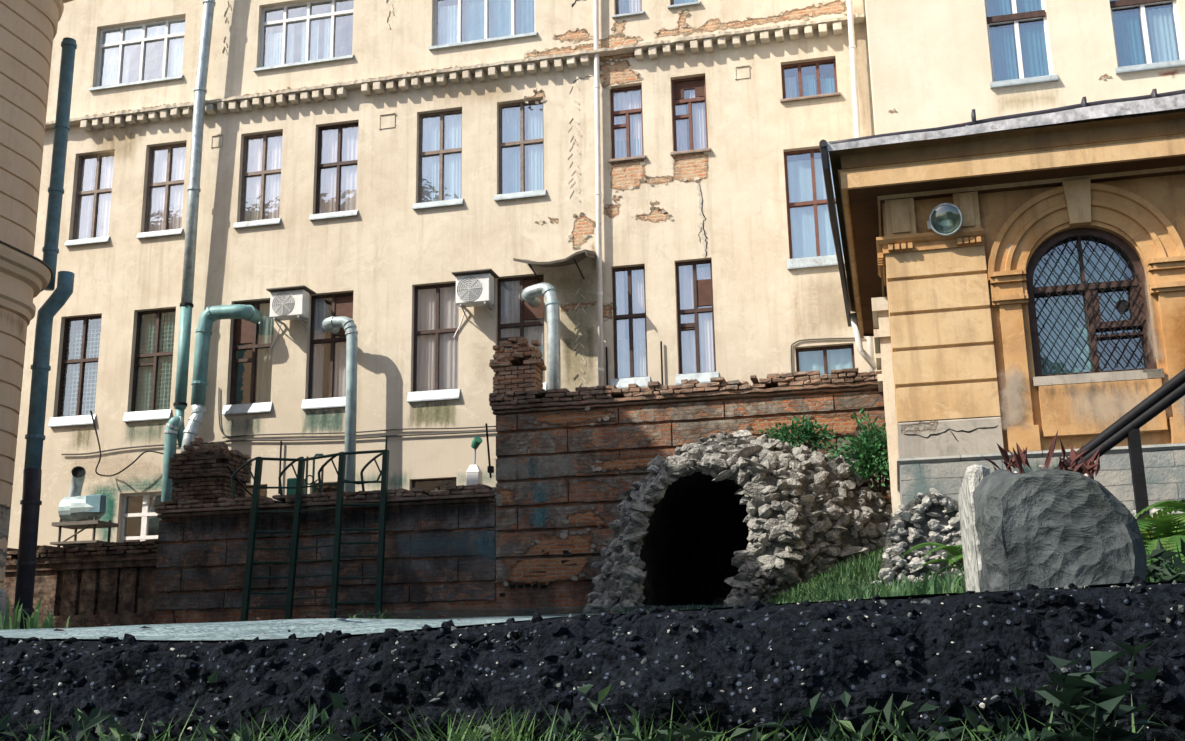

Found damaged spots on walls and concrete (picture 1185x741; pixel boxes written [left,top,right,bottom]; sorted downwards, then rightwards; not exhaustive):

peeling [523,0,847,90]
peeling [568,86,710,250]
crack [696,183,708,257]
crack [904,426,997,442]
peeling [0,504,11,568]
peeling [478,509,605,600]